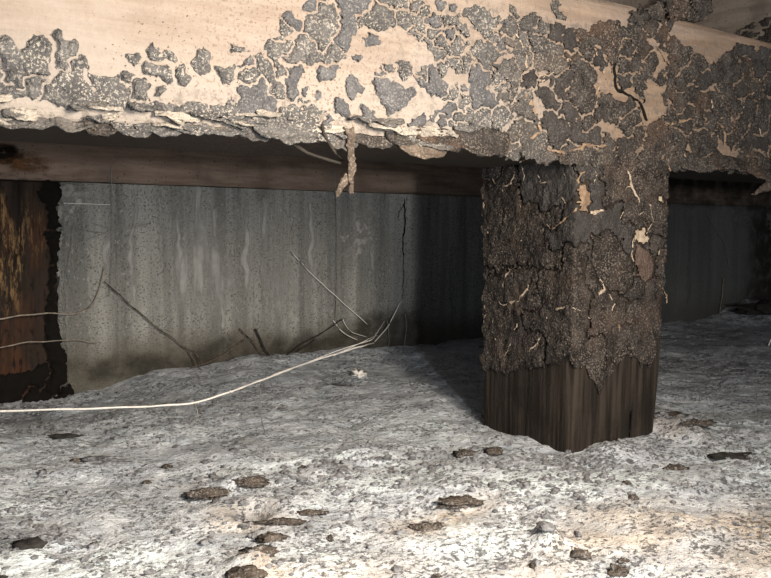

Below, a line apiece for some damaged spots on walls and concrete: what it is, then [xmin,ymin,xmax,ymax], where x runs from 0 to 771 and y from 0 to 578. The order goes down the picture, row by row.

peeling [0,0,771,404]